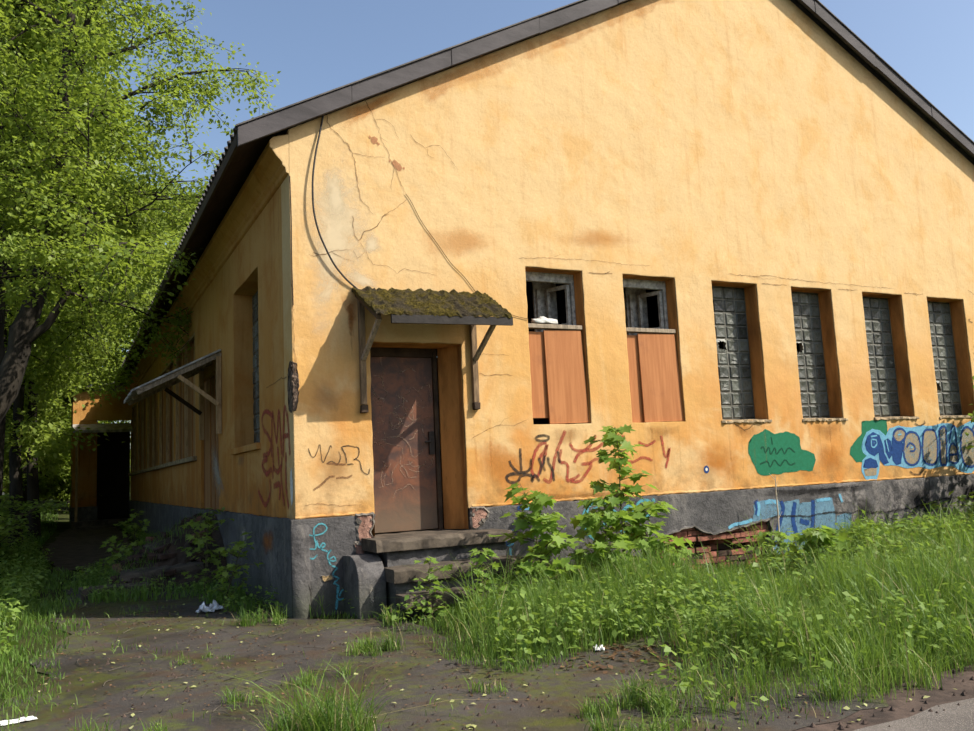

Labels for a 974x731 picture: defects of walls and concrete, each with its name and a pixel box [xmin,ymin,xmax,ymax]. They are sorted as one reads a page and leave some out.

crack [311,116,450,275]
flaking render [657,518,773,569]